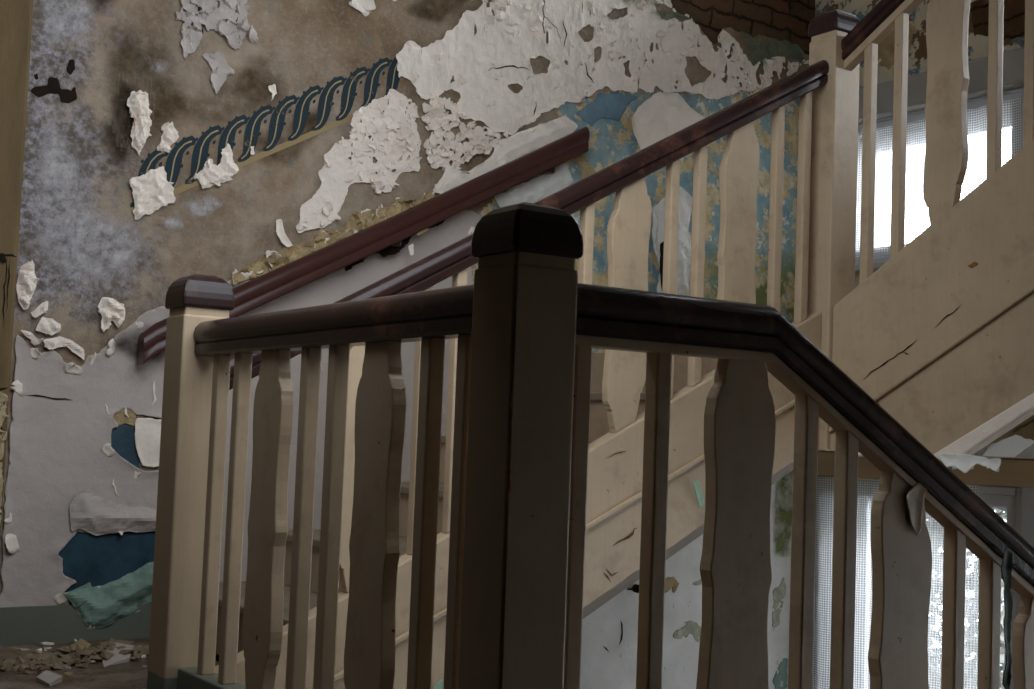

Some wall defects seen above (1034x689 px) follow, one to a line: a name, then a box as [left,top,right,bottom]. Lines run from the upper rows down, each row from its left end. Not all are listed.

peeling [176,0,259,94]
peeling [227,0,815,296]
peeling [238,210,481,317]
peeling [0,260,170,608]
peeling [219,389,233,582]
peeling [241,375,259,581]
peeling [287,354,301,530]
peeling [313,348,329,530]
peeling [401,342,415,482]
peeling [441,339,450,436]
peeling [938,415,1034,473]